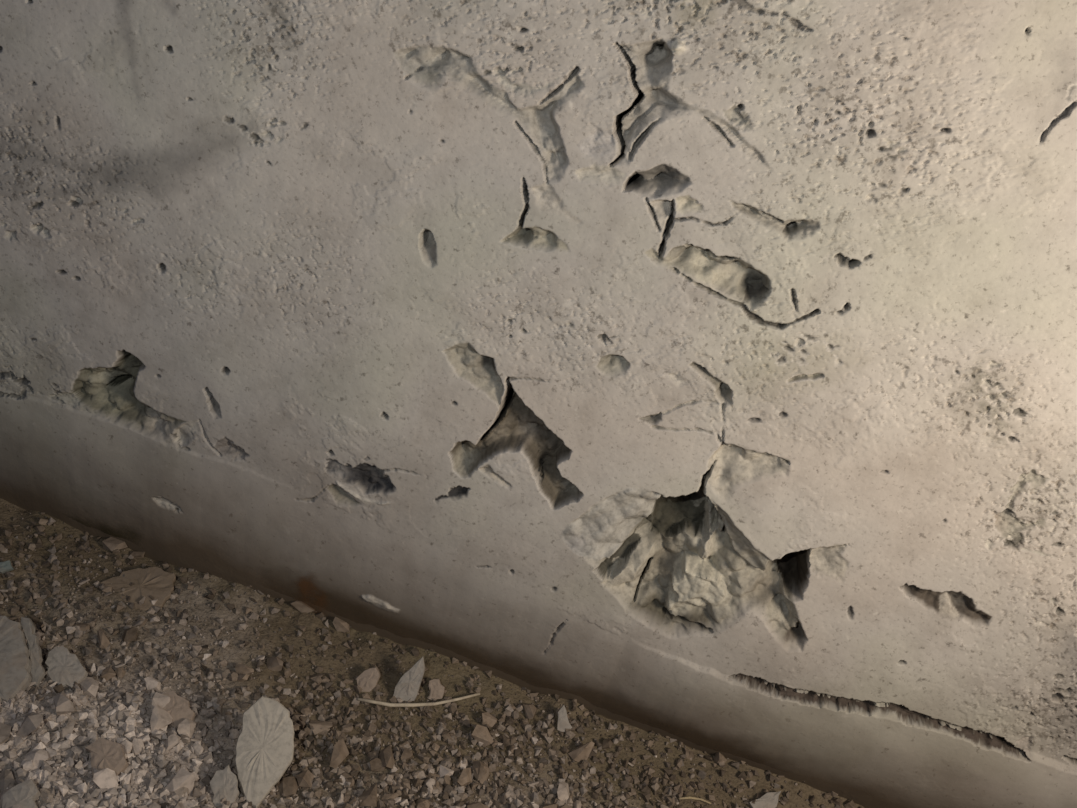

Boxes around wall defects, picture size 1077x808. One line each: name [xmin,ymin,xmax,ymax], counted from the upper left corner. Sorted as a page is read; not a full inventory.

spalling [393,0,852,368]
peeling [857,119,928,217]
spalling [833,250,875,271]
spalling [48,349,250,463]
peeling [294,449,396,509]
spalling [432,341,850,654]
spalling [898,583,994,629]
crack [727,673,1035,764]
crack [1061,755,1077,767]